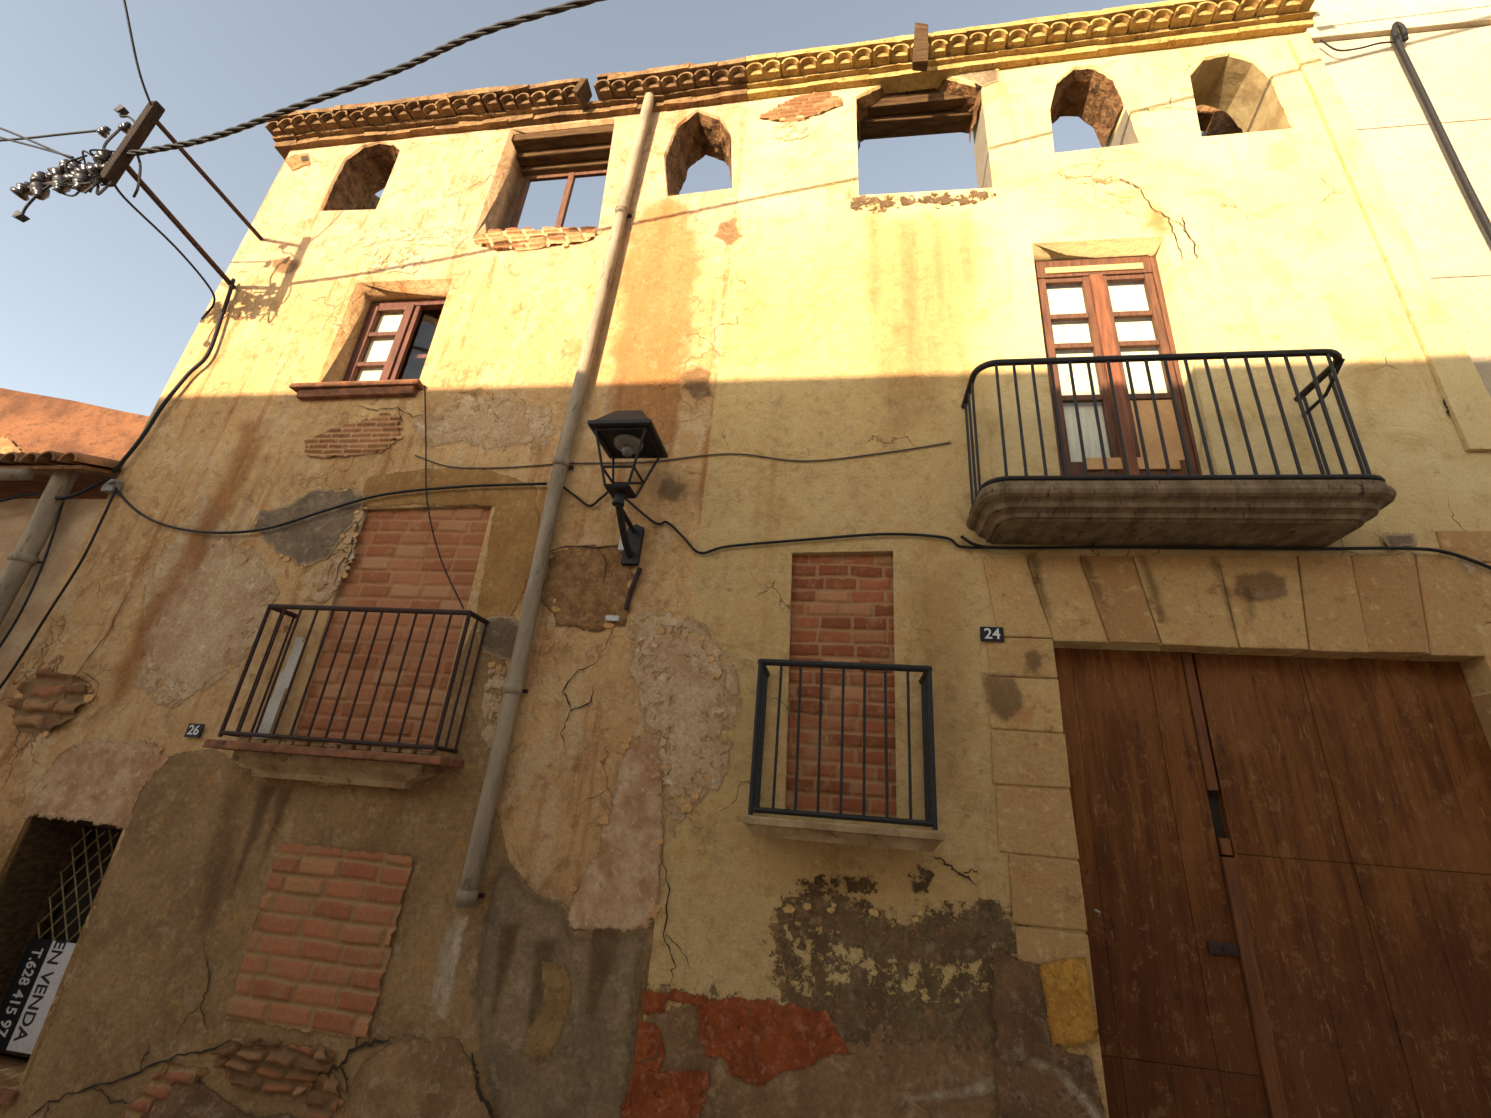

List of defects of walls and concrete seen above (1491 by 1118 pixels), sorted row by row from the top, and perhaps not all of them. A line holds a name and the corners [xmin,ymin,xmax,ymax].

spalling [759,92,843,141]
crack [1083,175,1201,259]
flaking render [130,487,367,708]
damp [1235,572,1286,600]
spalling [7,667,169,829]
crack [560,629,613,752]
peeling [541,544,742,933]
crack [31,942,234,1118]
crack [313,1037,395,1093]
damp [433,866,644,1118]
crack [662,846,689,985]
peeling [619,890,1028,1118]